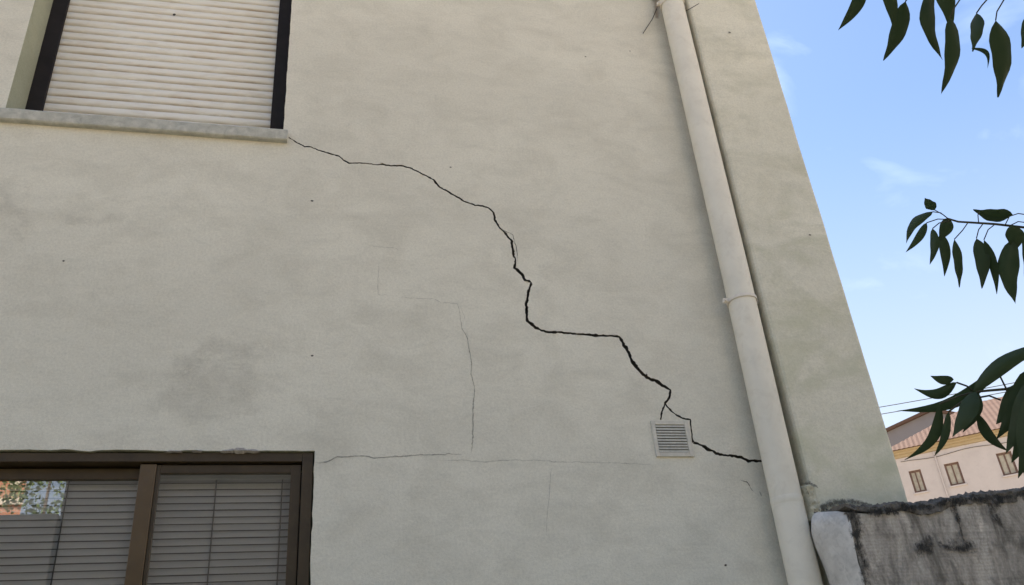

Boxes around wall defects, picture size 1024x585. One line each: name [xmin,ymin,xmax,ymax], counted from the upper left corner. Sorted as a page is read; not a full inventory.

crack [289,137,762,491]